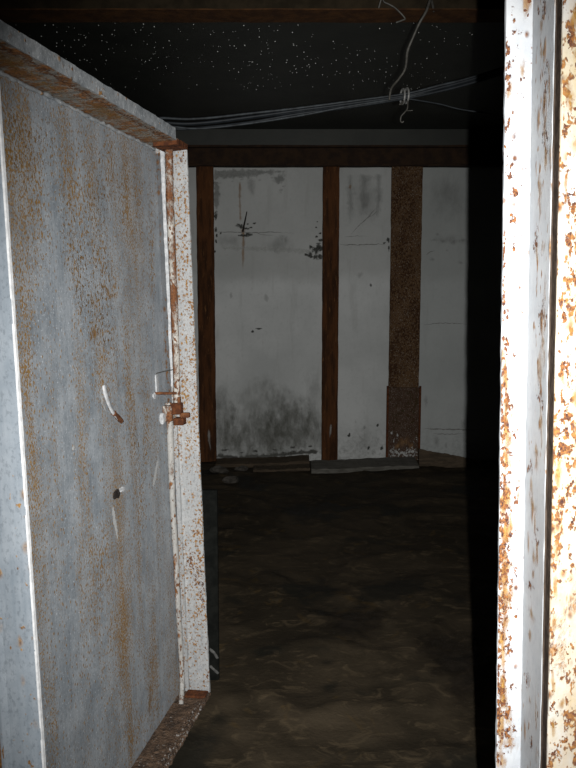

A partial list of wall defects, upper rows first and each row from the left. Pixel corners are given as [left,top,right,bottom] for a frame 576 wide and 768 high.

corrosion [567,9,576,49]
corrosion [505,40,525,94]
corrosion [565,180,576,222]
corrosion [502,213,516,322]
corrosion [558,267,576,330]
corrosion [558,357,571,379]
corrosion [556,389,576,531]
corrosion [496,333,520,765]